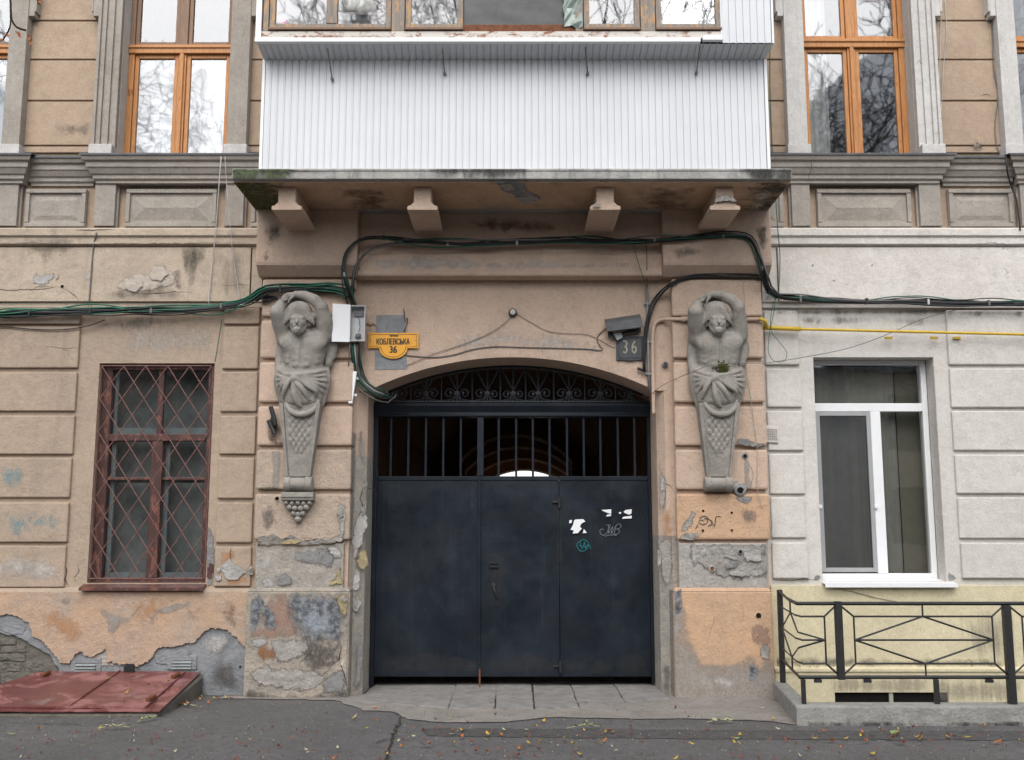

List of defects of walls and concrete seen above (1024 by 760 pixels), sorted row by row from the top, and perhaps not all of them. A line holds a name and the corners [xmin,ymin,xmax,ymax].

flaking render [117,265,175,294]
flaking render [207,559,253,581]
flaking render [258,505,368,616]
flaking render [657,529,768,584]
water stain [664,511,875,698]
flaking render [0,614,327,695]